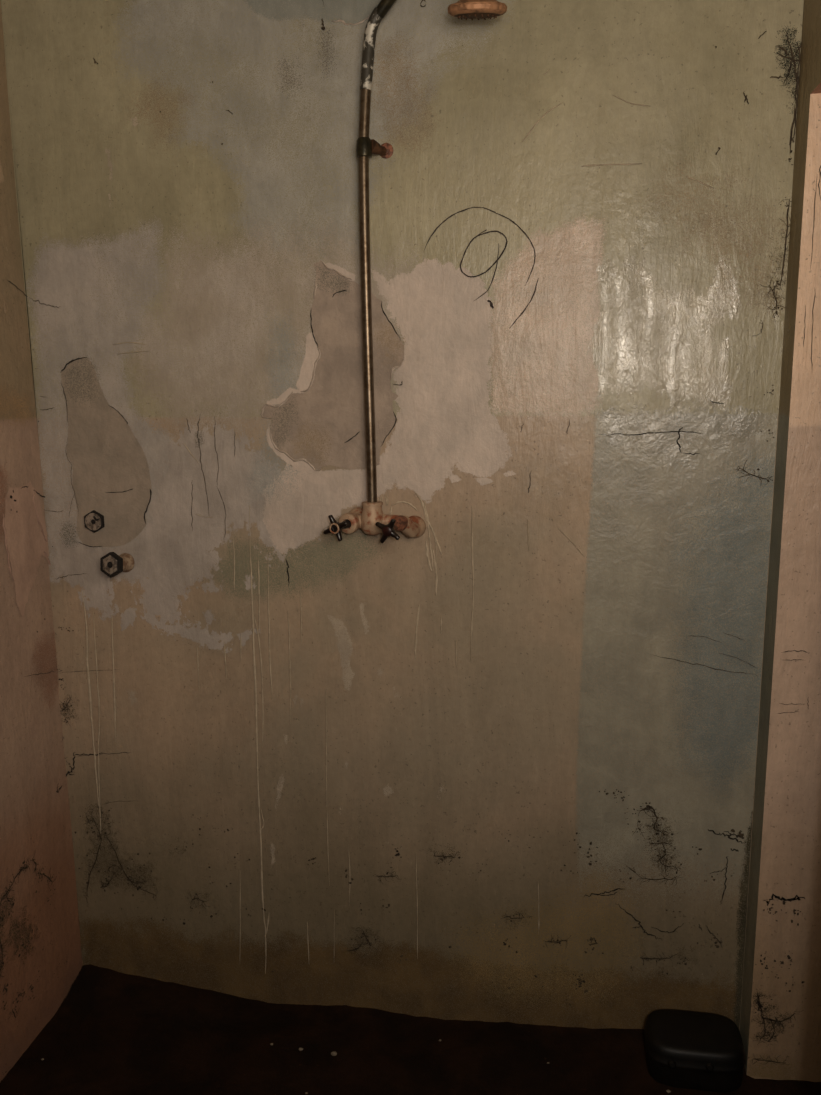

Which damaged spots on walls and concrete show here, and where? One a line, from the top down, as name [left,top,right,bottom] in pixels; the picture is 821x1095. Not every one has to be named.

water stain [770,26,802,165]
peeling [2,0,518,657]
crack [604,428,701,455]
water stain [0,612,804,1081]
crack [585,829,744,947]
crack [764,894,805,906]